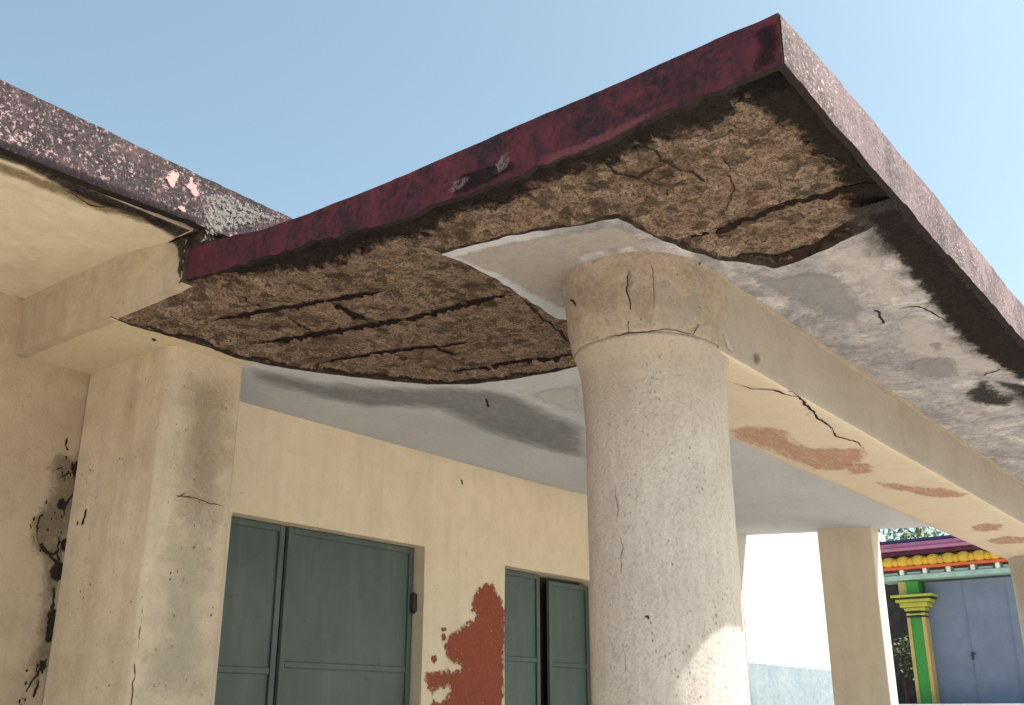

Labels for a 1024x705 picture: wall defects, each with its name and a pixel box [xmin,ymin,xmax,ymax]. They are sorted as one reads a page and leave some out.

spalling [119,93,900,384]
damp [225,26,1024,406]
crack [609,265,701,337]
damp [265,376,581,453]
crack [734,383,864,448]
damp [19,437,91,705]
peeling [424,583,506,705]